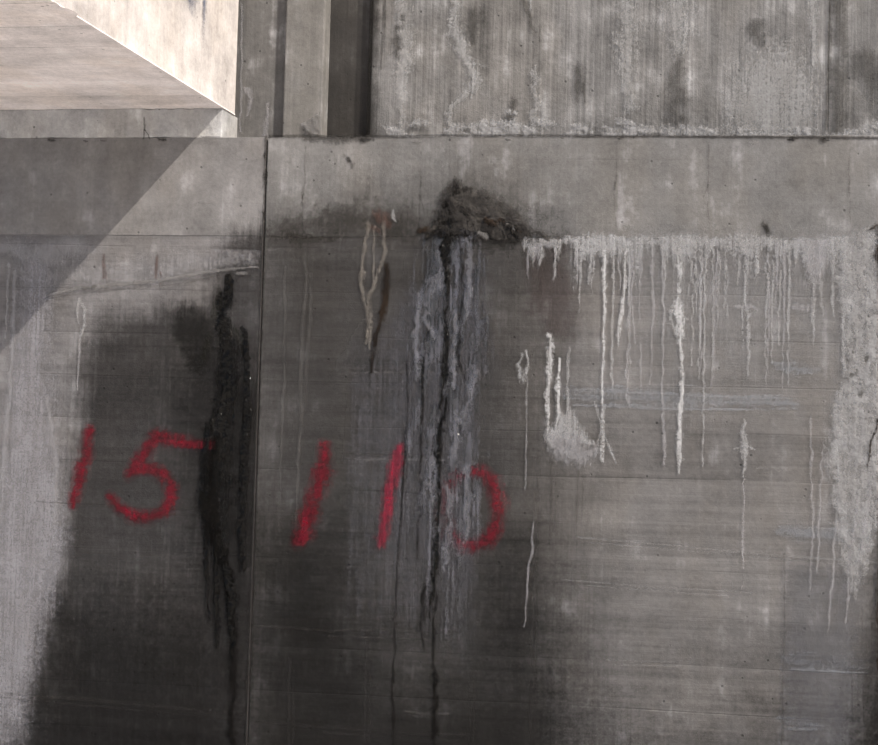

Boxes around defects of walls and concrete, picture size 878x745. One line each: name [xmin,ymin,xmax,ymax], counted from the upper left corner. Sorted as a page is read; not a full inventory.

leakage [394,220,489,741]
leakage [554,358,569,432]
leakage [579,240,631,460]
leakage [662,236,728,473]
leakage [738,243,790,371]